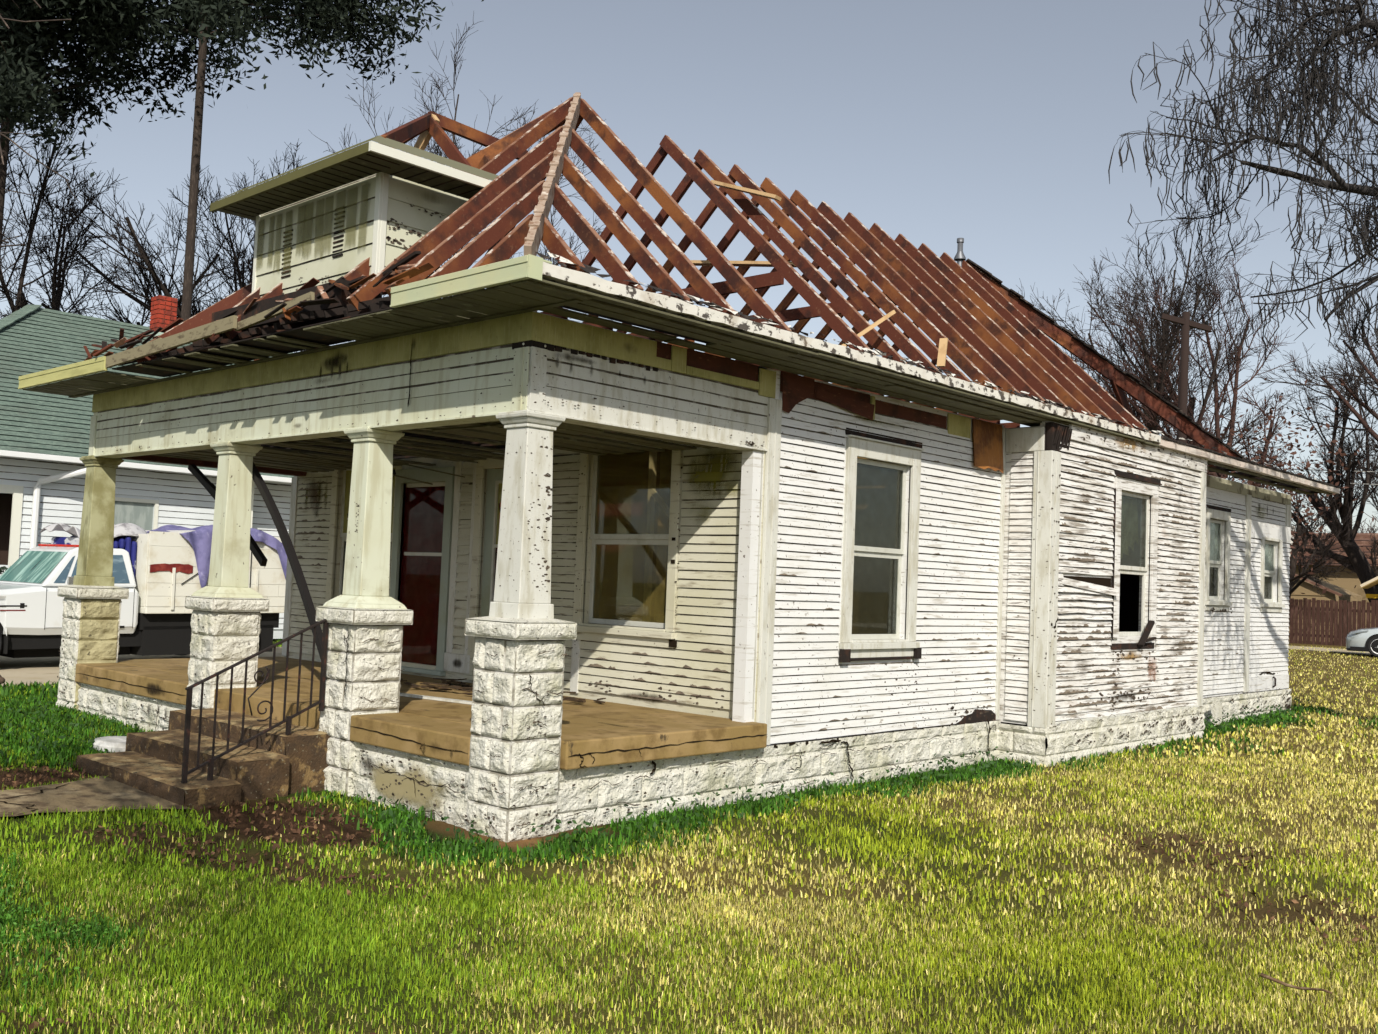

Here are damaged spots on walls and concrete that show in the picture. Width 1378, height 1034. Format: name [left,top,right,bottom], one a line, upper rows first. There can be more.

water stain [320,354,348,376]
peeling [1012,422,1293,759]
peeling [538,639,728,703]
crack [569,734,767,775]
crack [790,739,854,783]
spalling [750,662,994,787]